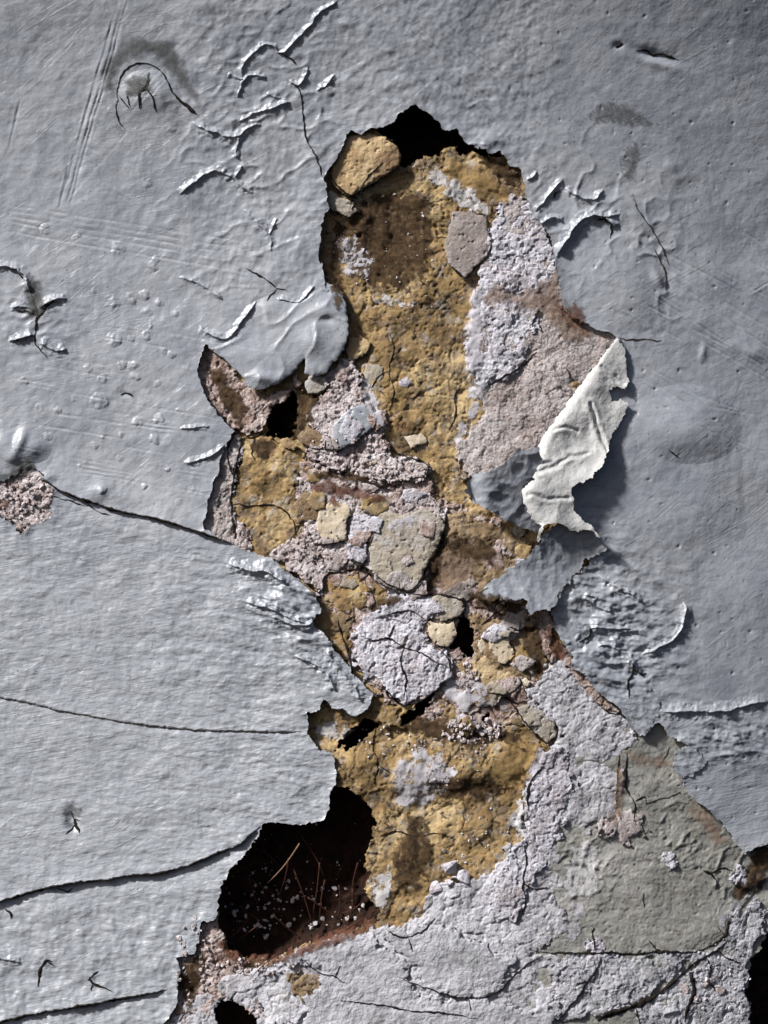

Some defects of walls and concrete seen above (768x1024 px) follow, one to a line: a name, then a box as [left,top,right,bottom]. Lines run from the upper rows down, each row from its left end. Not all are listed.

crack [115,62,197,127]
crack [8,268,56,359]
crack [246,268,286,300]
spalling [0,469,54,534]
crack [42,433,296,545]
spalling [164,105,768,1024]
crack [1,697,301,732]
crack [0,835,251,918]
crack [0,971,162,1023]
crack [307,893,754,1022]